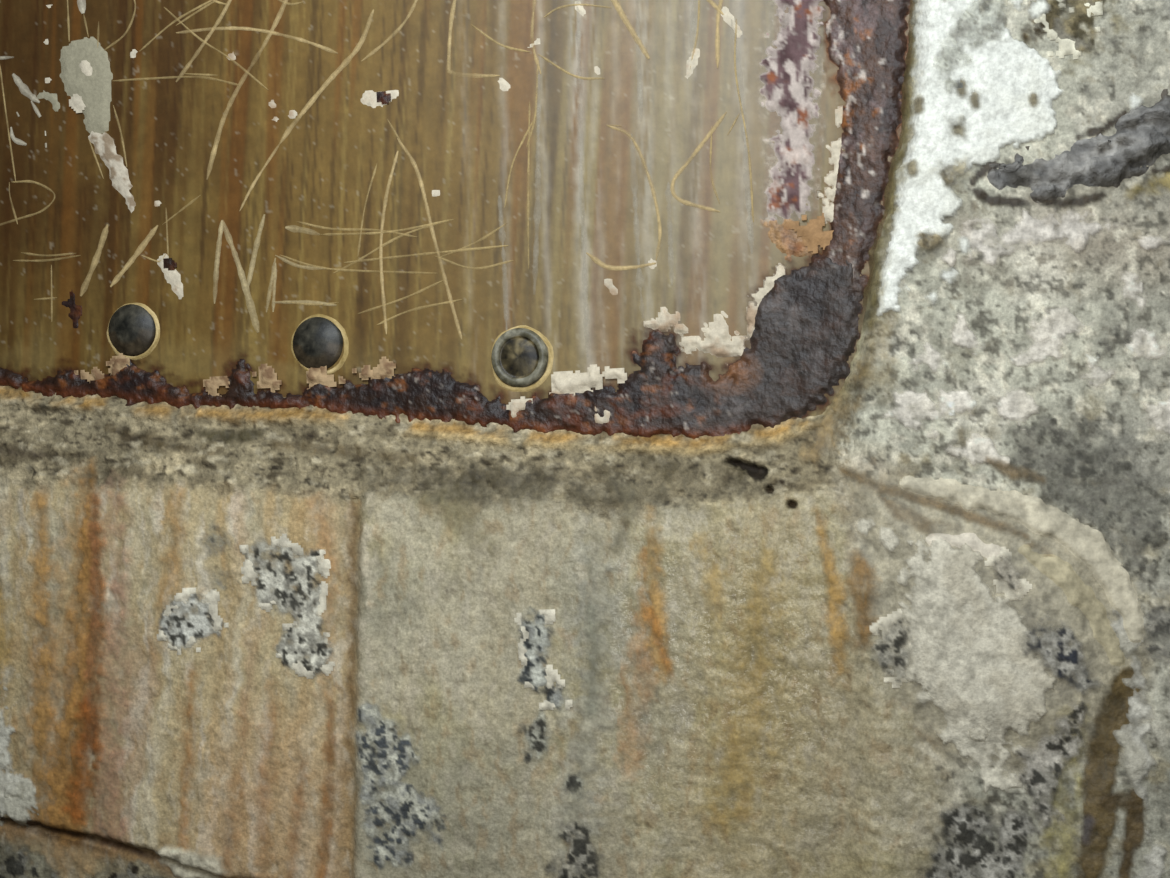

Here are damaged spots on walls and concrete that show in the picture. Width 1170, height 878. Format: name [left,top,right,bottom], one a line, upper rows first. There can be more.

corrosion [0,0,912,439]
damp [866,259,880,306]
damp [883,31,915,216]
peeling [877,0,1110,316]
damp [202,430,263,443]
damp [801,397,858,460]
peeling [0,707,39,826]
corrosion [34,495,122,855]
spalling [239,534,335,679]
spalling [356,703,444,867]
peeling [857,519,1100,878]
damp [1058,668,1144,878]